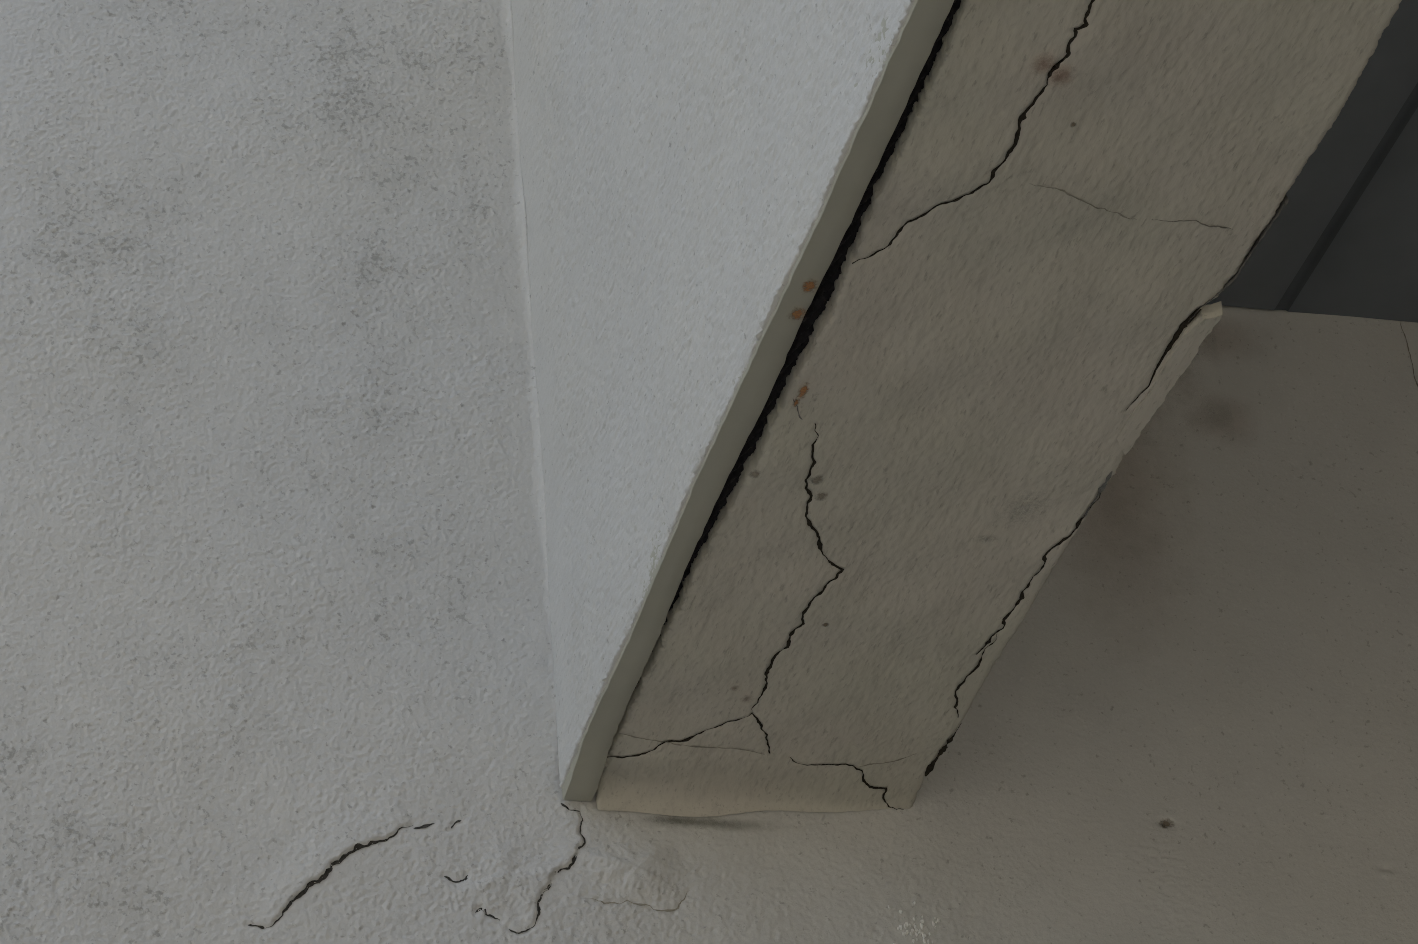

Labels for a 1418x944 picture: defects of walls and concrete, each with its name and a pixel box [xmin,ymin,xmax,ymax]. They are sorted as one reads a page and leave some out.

crack [852,0,1231,264]
crack [607,399,914,810]
crack [954,489,1101,717]
crack [248,820,461,929]
crack [444,803,586,934]
crack [591,893,687,912]